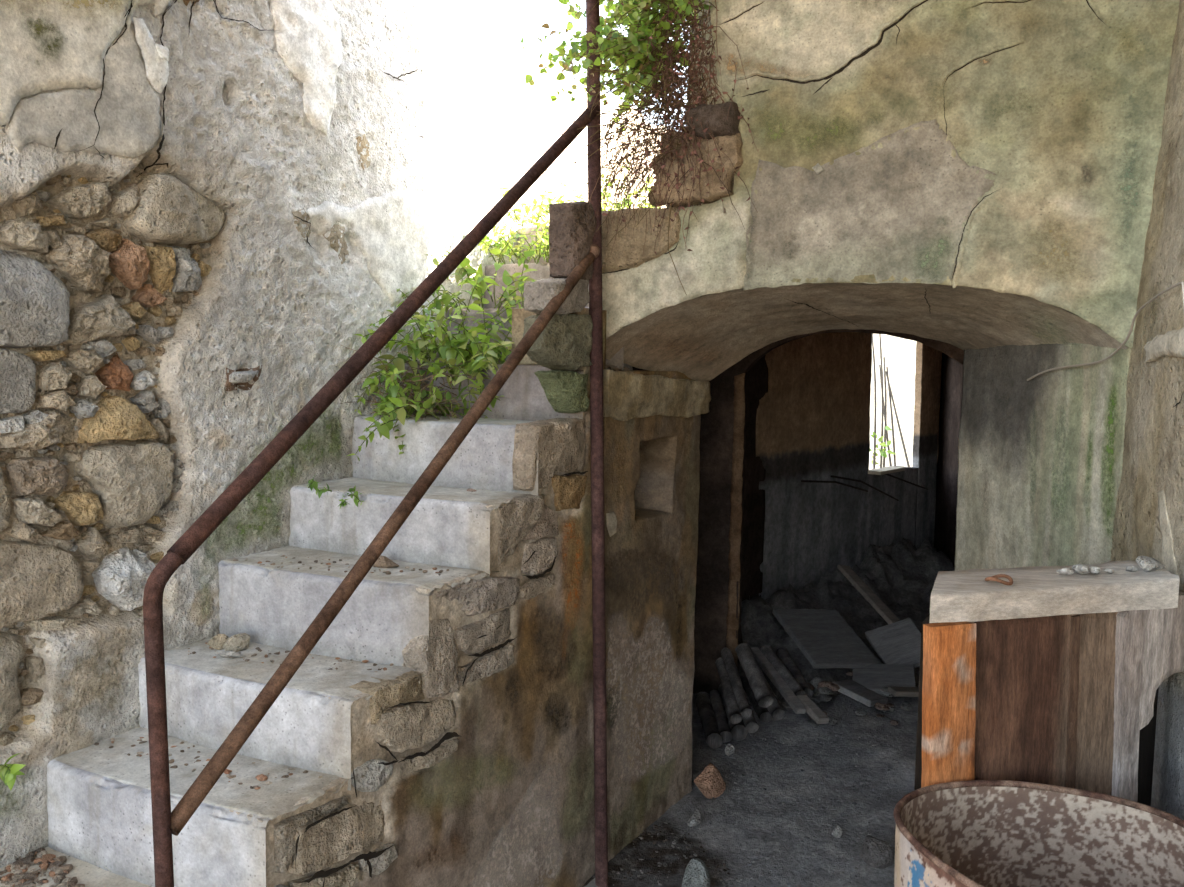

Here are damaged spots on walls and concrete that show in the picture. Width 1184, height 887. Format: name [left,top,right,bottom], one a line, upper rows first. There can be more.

crack [54,0,280,183]
crack [718,0,928,97]
crack [939,39,1024,135]
crack [964,0,1031,10]
crack [1086,0,1110,25]
peeling [744,119,996,290]
crack [924,188,1004,311]
spalling [0,162,225,746]